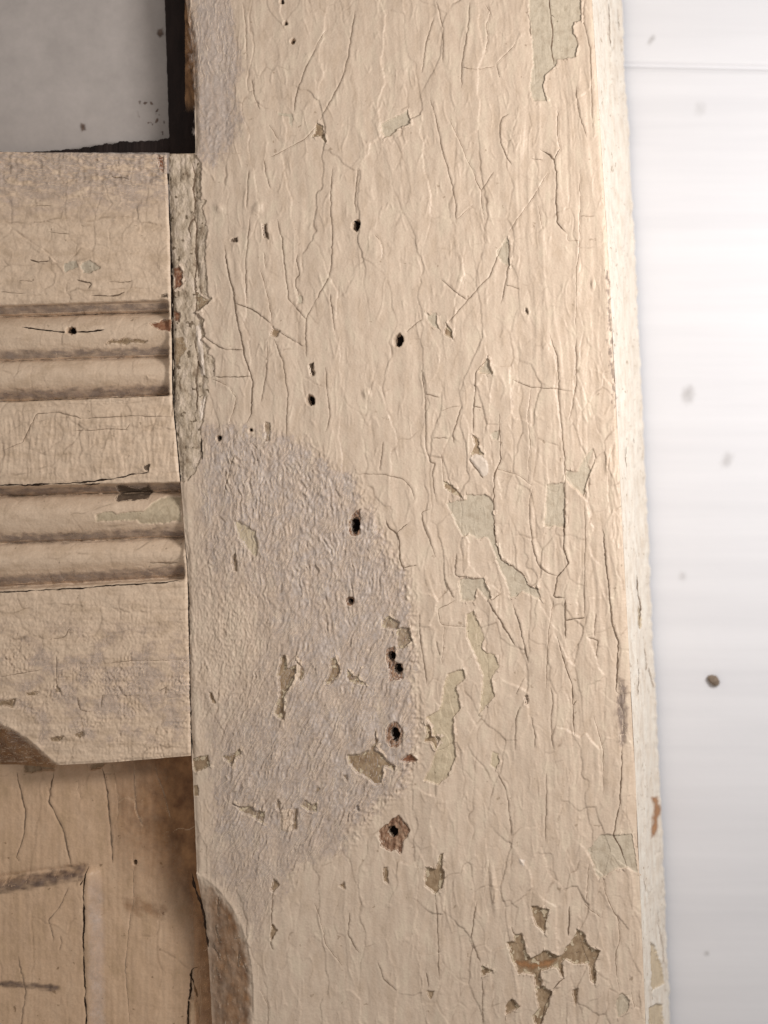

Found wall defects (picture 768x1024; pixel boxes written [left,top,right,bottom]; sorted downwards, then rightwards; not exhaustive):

crack [247,16,355,200]
peeling [528,0,585,103]
crack [0,164,358,497]
peeling [151,154,217,482]
peeling [96,485,182,524]
crack [380,0,654,863]
peeling [344,574,502,786]
crack [16,769,135,1024]
crack [187,874,269,1024]
peeling [425,853,449,896]
peeling [506,905,604,1024]
crack [568,868,635,1007]